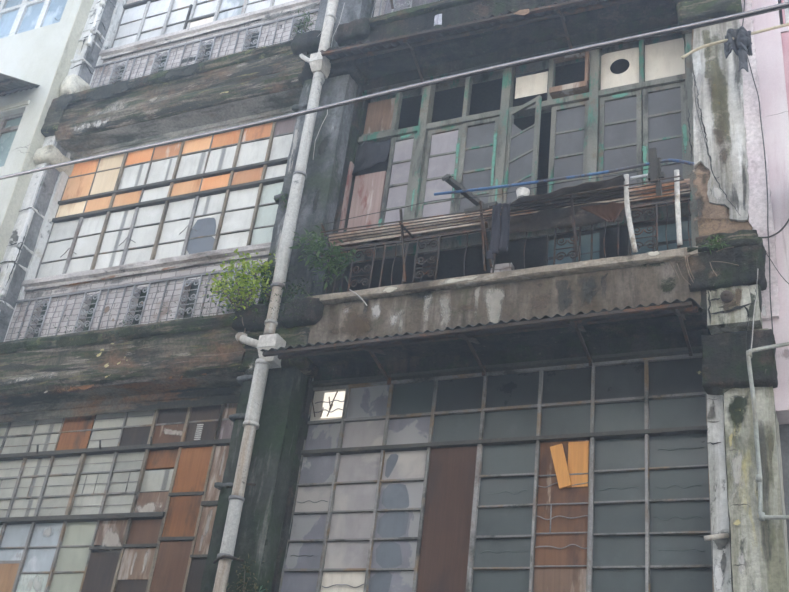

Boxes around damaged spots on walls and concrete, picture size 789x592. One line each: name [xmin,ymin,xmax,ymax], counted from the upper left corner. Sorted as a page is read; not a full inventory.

water stain [54,64,206,111]
water stain [702,31,741,163]
spalling [691,164,729,224]
water stain [730,168,746,210]
water stain [409,291,450,320]
water stain [460,287,505,323]
water stain [755,423,774,505]